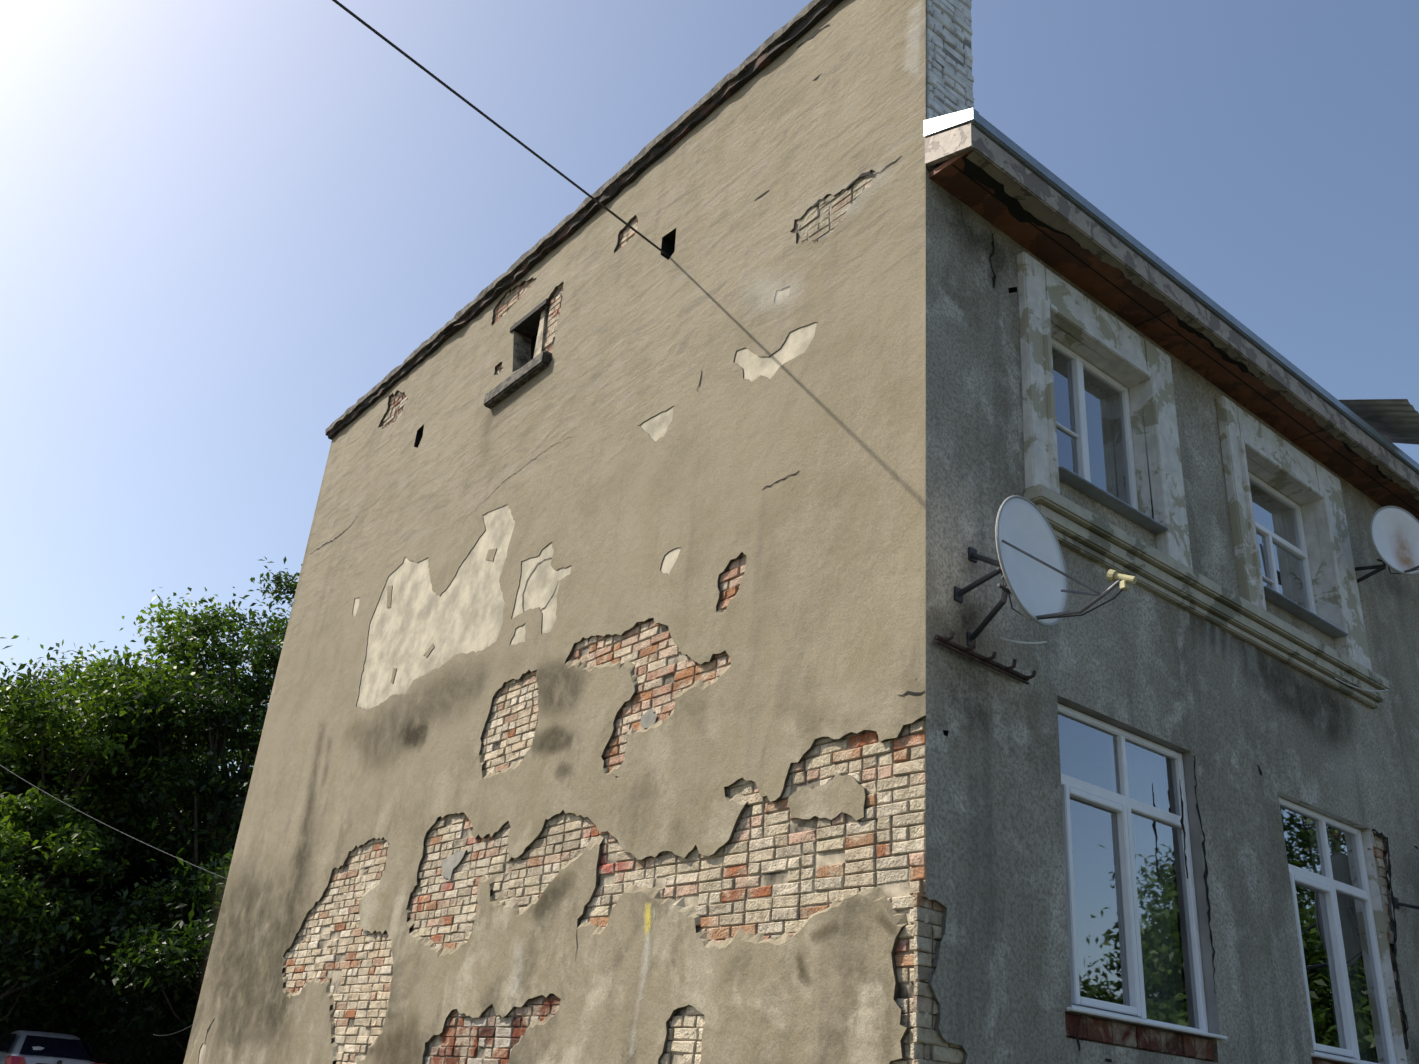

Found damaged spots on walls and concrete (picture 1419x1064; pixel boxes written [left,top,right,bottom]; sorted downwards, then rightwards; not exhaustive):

flaking render [790,170,878,244]
flaking render [491,277,537,326]
flaking render [533,281,564,358]
flaking render [716,552,747,615]
flaking render [479,670,539,779]
flaking render [564,618,731,779]
flaking render [406,715,968,1064]
flaking render [282,837,393,1064]
flaking render [1368,832,1408,1061]